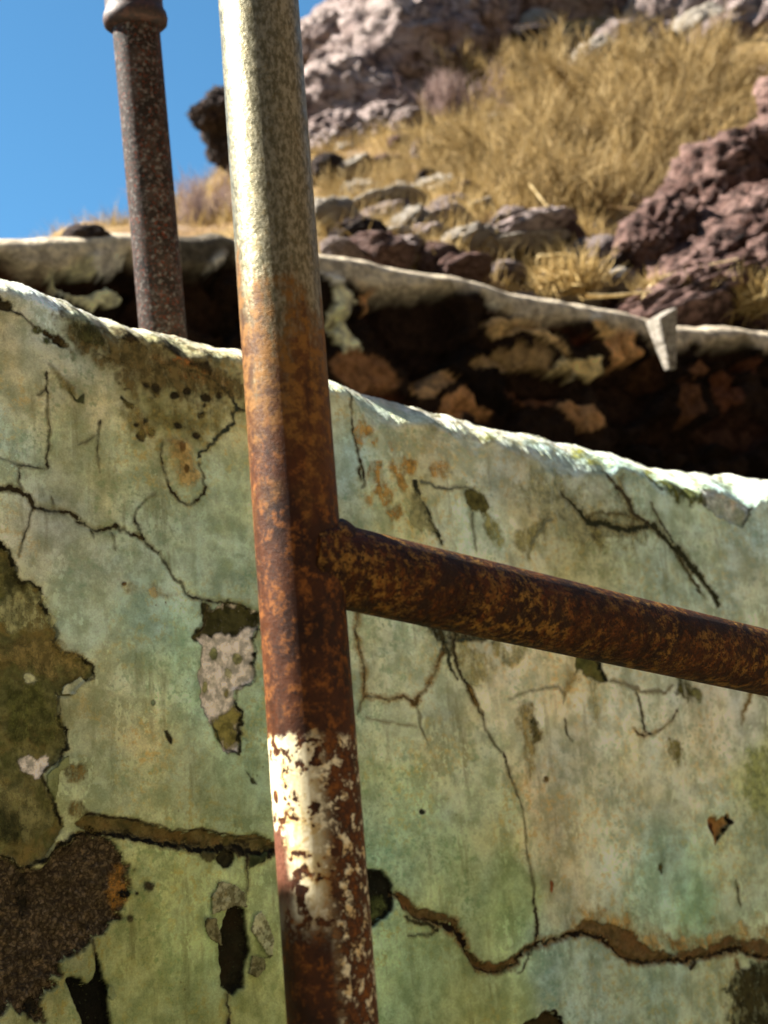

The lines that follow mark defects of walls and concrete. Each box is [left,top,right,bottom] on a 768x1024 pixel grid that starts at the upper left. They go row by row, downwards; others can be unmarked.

crack [0,364,253,614]
rust [366,449,417,520]
crack [410,479,489,550]
crack [528,470,721,608]
peeling [192,599,260,756]
peeling [0,541,155,1024]
spalling [205,854,274,1024]
spalling [367,869,393,926]
crack [354,612,768,975]
spalling [707,814,734,845]